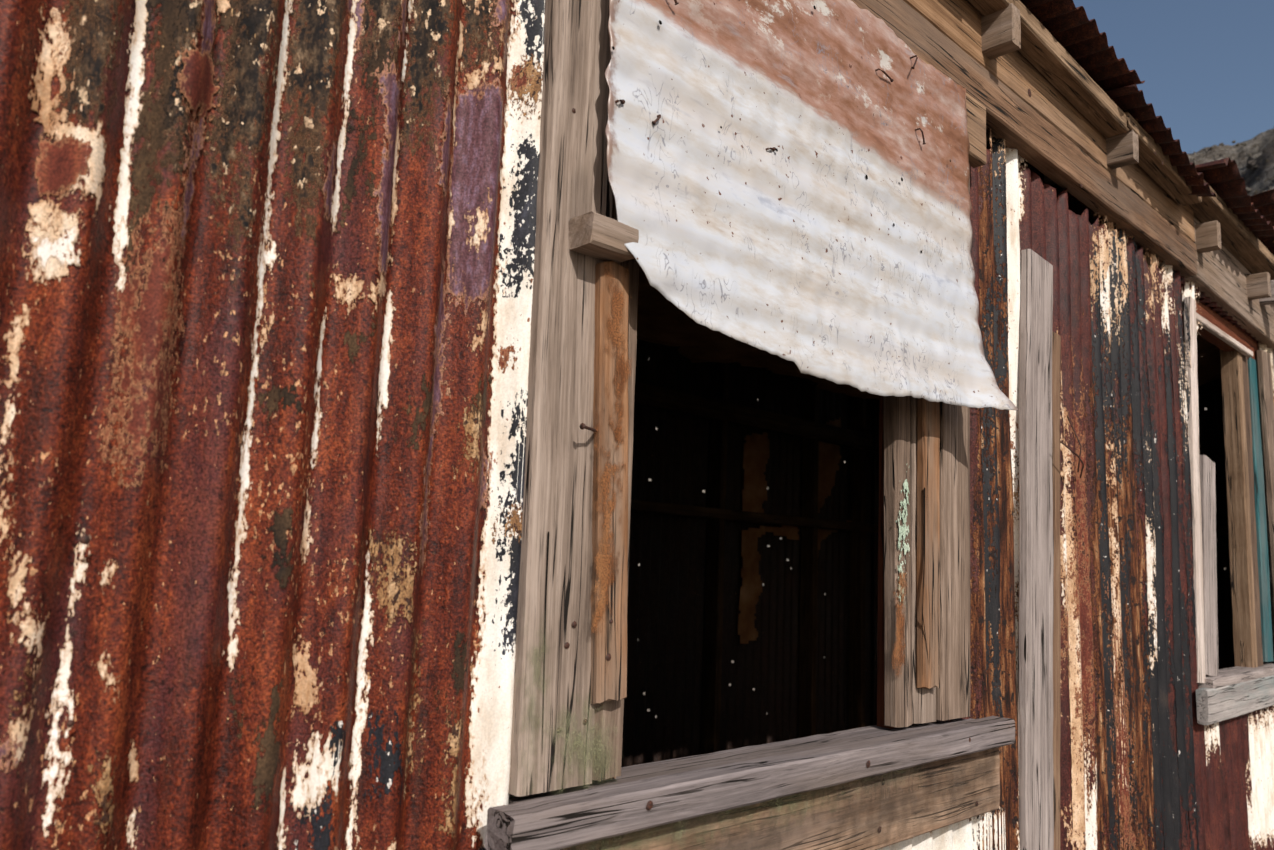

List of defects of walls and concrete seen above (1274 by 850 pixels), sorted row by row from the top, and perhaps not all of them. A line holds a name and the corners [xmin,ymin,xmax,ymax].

corrosion [0,732,23,774]
peeling [0,303,121,838]
peeling [19,0,196,292]
peeling [86,740,140,850]
corrosion [90,37,220,497]
peeling [217,0,233,21]
peeling [222,0,293,672]
peeling [276,0,546,850]
peeling [1060,355,1098,850]
corrosion [1064,296,1159,850]
peeling [1204,722,1221,766]
peeling [1245,705,1274,850]